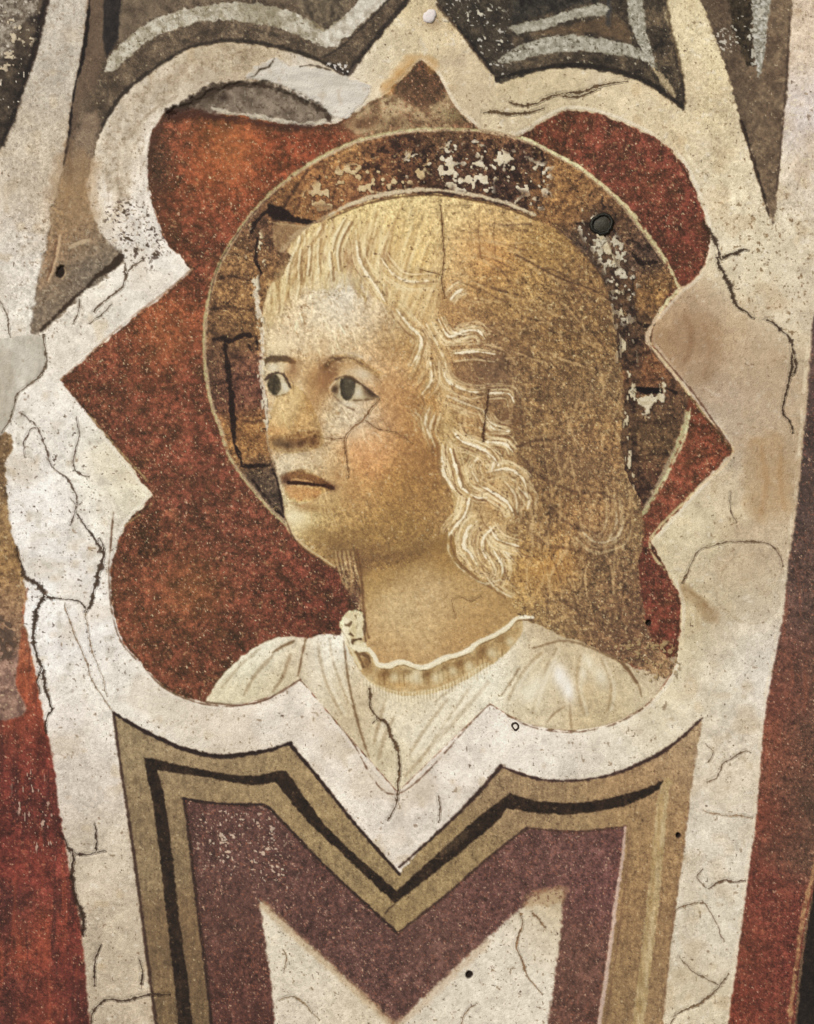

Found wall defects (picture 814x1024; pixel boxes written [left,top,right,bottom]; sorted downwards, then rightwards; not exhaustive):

flaking render [145,79,335,184]
peeling [300,139,557,213]
crack [483,80,628,117]
crack [0,300,12,337]
peeling [567,197,667,491]
crack [702,221,799,434]
crack [316,398,414,478]
crack [1,334,113,734]
crack [367,688,402,822]
crack [435,795,443,823]